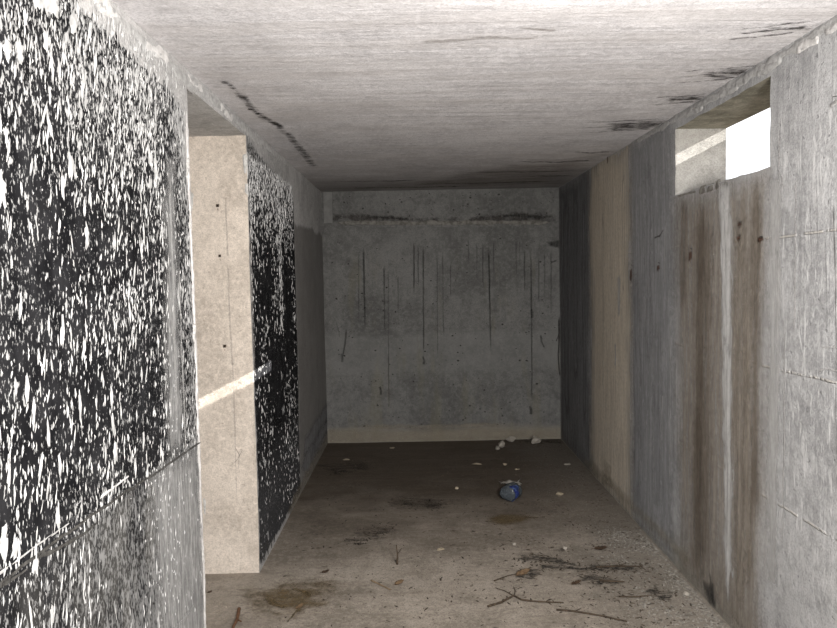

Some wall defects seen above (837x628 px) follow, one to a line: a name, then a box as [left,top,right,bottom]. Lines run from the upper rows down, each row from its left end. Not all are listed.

water stain [550,120,785,628]